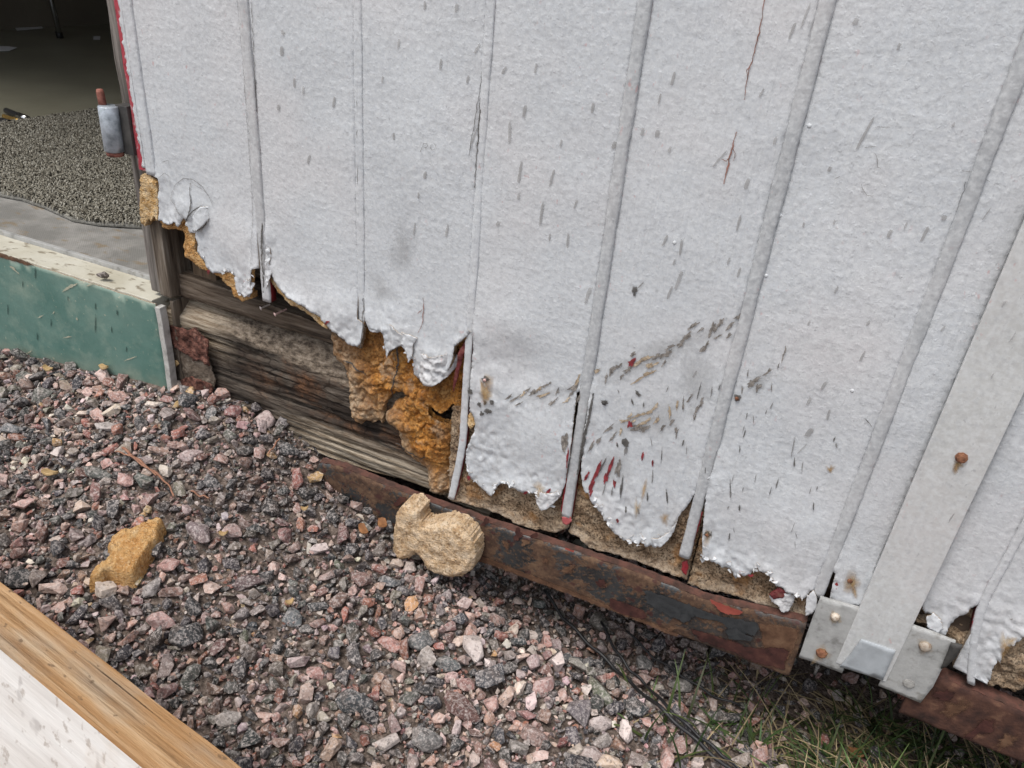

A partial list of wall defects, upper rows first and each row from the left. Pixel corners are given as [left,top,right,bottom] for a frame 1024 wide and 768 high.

crack [744,0,765,100]
crack [722,132,737,184]
peeling [192,206,210,232]
peeling [237,248,272,298]
peeling [169,325,216,394]
peeling [367,325,458,387]
peeling [467,465,572,525]
peeling [619,520,678,548]
corrosion [479,556,678,636]
peeling [681,532,817,616]
corrosion [691,623,799,670]